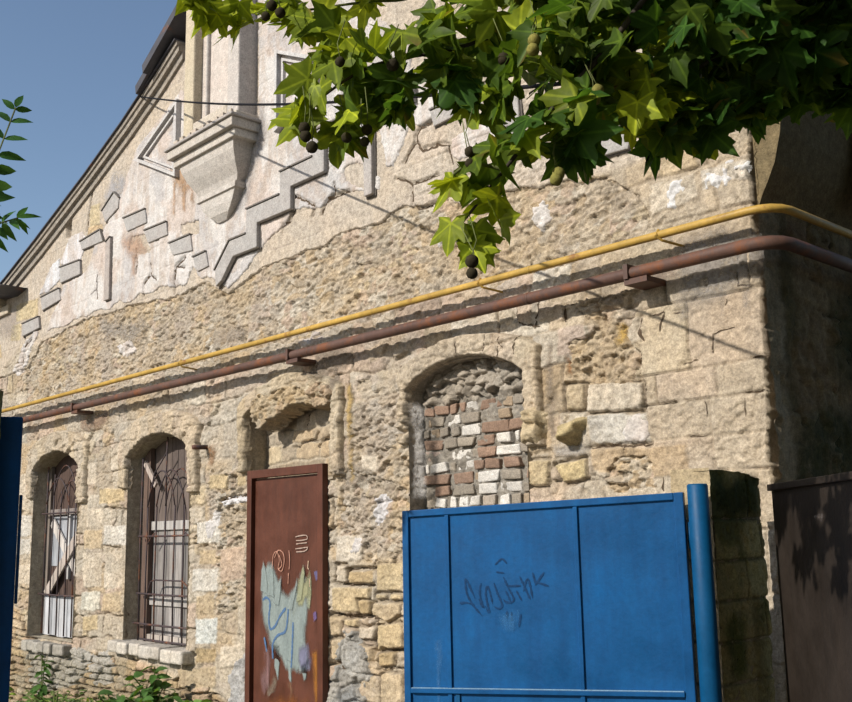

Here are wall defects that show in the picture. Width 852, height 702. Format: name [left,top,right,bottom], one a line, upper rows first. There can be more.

peeling [335,0,390,38]
peeling [704,159,752,189]
spalling [12,13,650,406]
peeling [667,179,685,209]